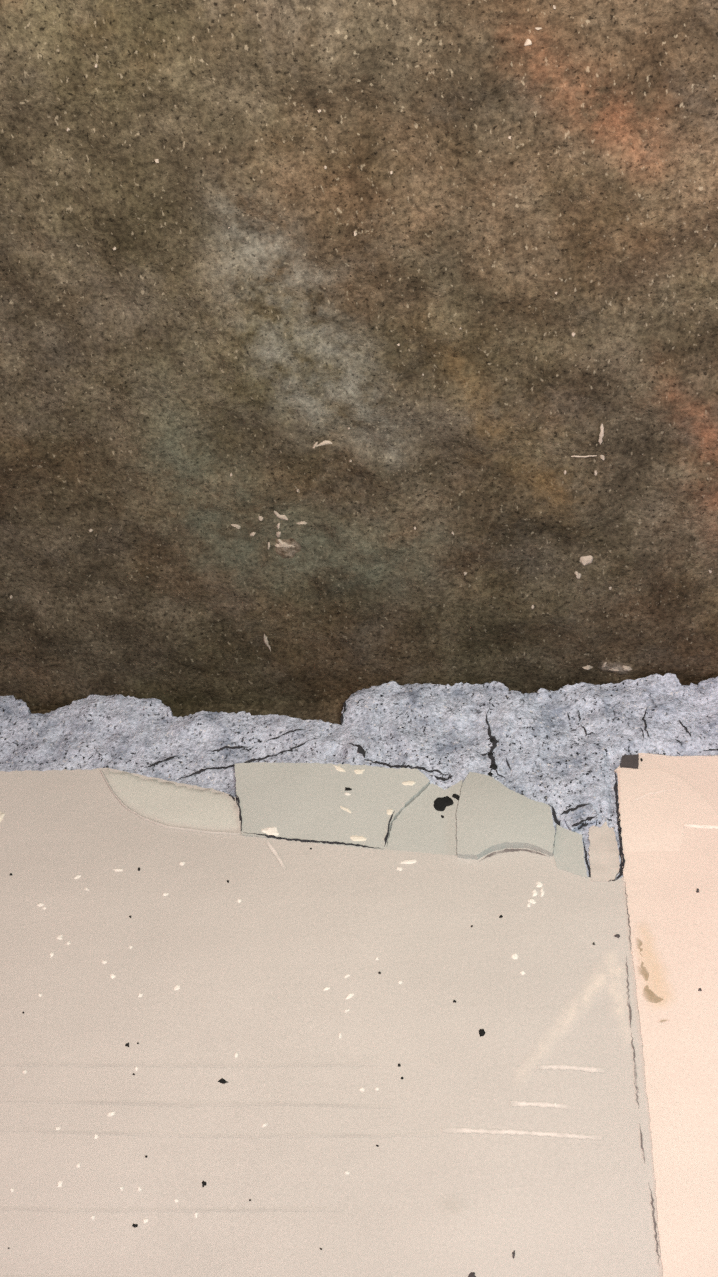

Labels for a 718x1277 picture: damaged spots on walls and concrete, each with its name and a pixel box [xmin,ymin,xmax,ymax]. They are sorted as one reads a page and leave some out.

water stain [98,142,493,624]
water stain [571,424,604,457]
peeling [267,523,295,549]
peeling [574,555,593,579]
spalling [0,662,718,882]
peeling [527,881,545,907]